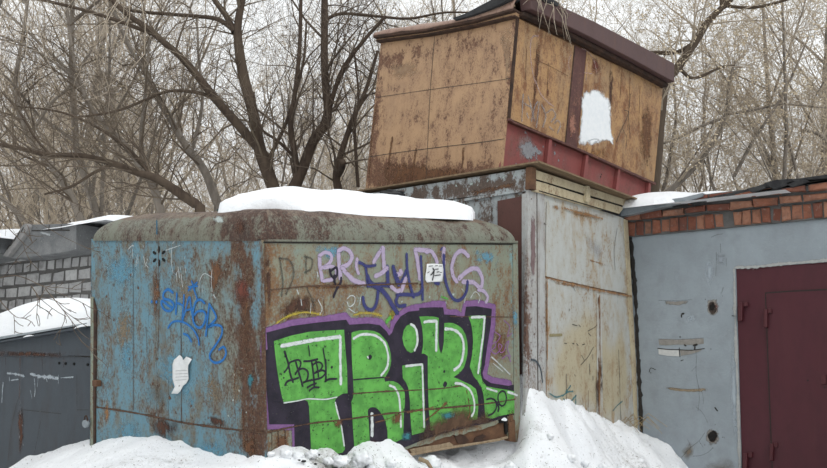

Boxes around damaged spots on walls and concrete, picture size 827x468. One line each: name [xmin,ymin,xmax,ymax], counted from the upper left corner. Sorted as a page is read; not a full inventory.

rust [525,50,549,108]
rust [609,74,651,166]
rust [385,137,464,184]
rust [206,260,224,291]
rust [235,281,250,354]
rust [546,277,632,415]
rust [153,419,175,436]
rust [234,359,257,456]